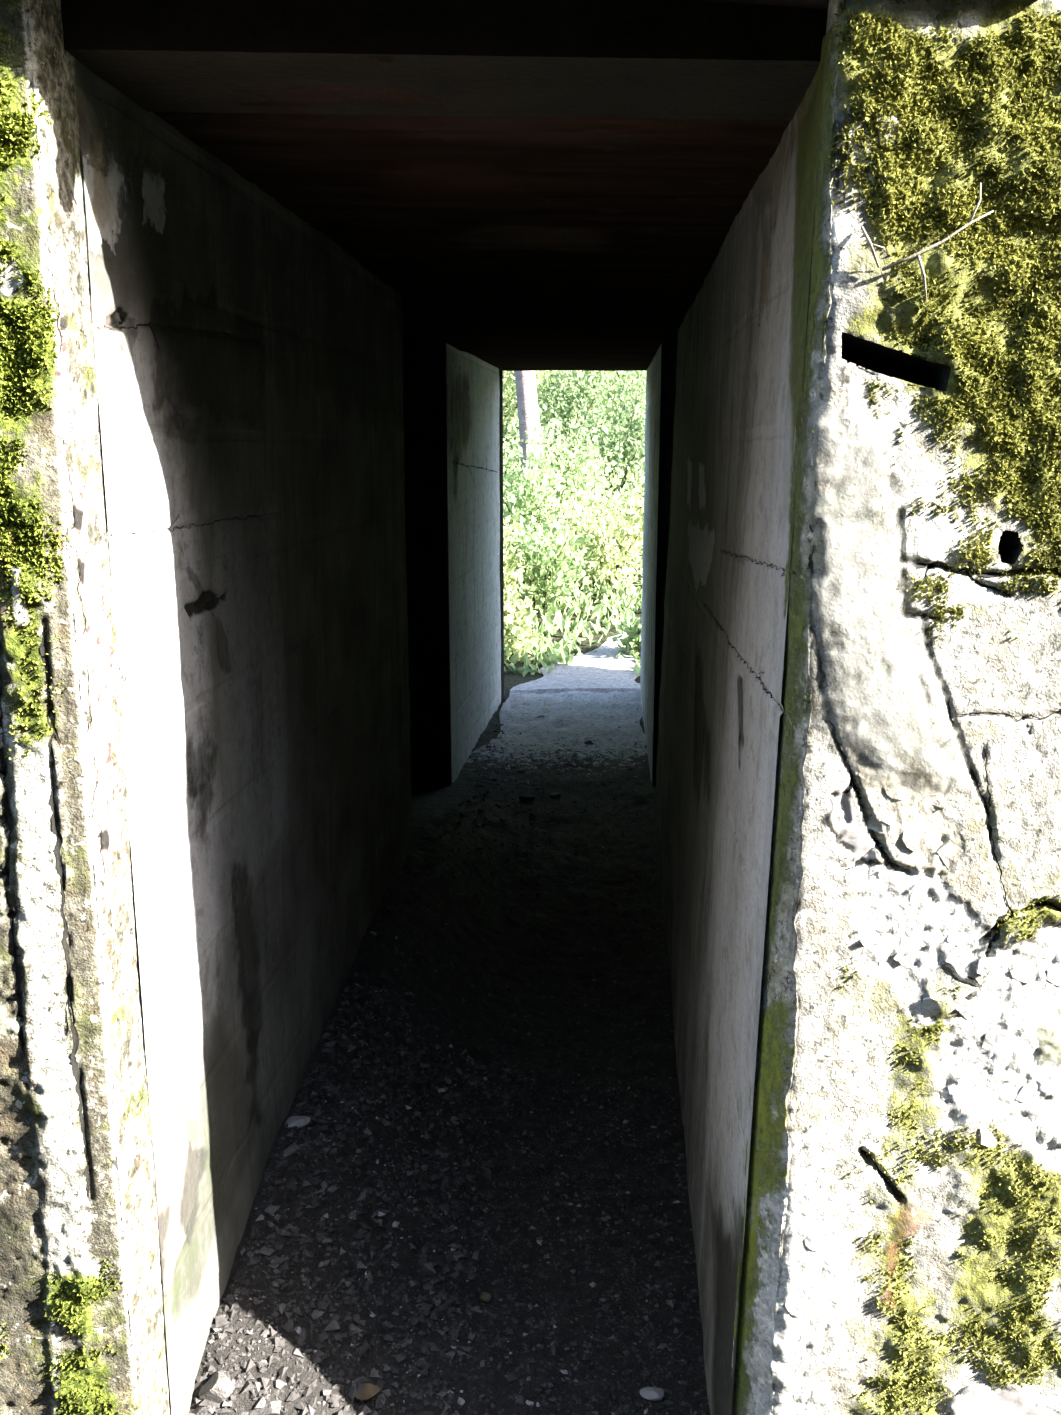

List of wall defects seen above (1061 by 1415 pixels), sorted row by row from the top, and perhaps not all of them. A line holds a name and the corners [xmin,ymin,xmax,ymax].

crack [0,675,25,1057]
crack [40,626,92,1197]
crack [897,509,1061,956]
flaking render [946,1384,1061,1415]